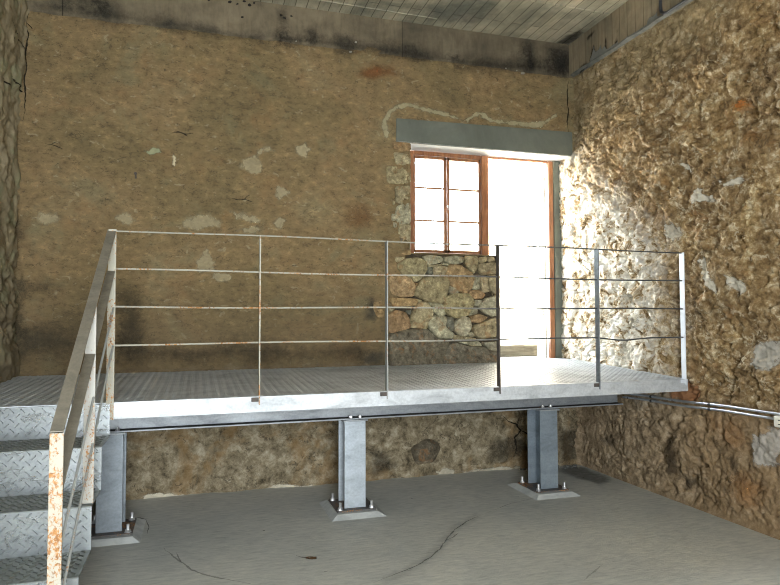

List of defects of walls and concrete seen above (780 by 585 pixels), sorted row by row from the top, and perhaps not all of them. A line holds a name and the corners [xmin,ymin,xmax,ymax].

crack [3,14,32,119]
damp [505,31,593,73]
flaking render [239,147,271,174]
flaking render [296,142,310,157]
flaking render [690,188,716,203]
flaking render [184,215,220,231]
flaking render [697,258,717,294]
flaking render [726,276,747,294]
flaking render [750,341,780,371]
crack [503,416,527,457]
flaking render [751,427,780,467]
crack [373,498,533,583]